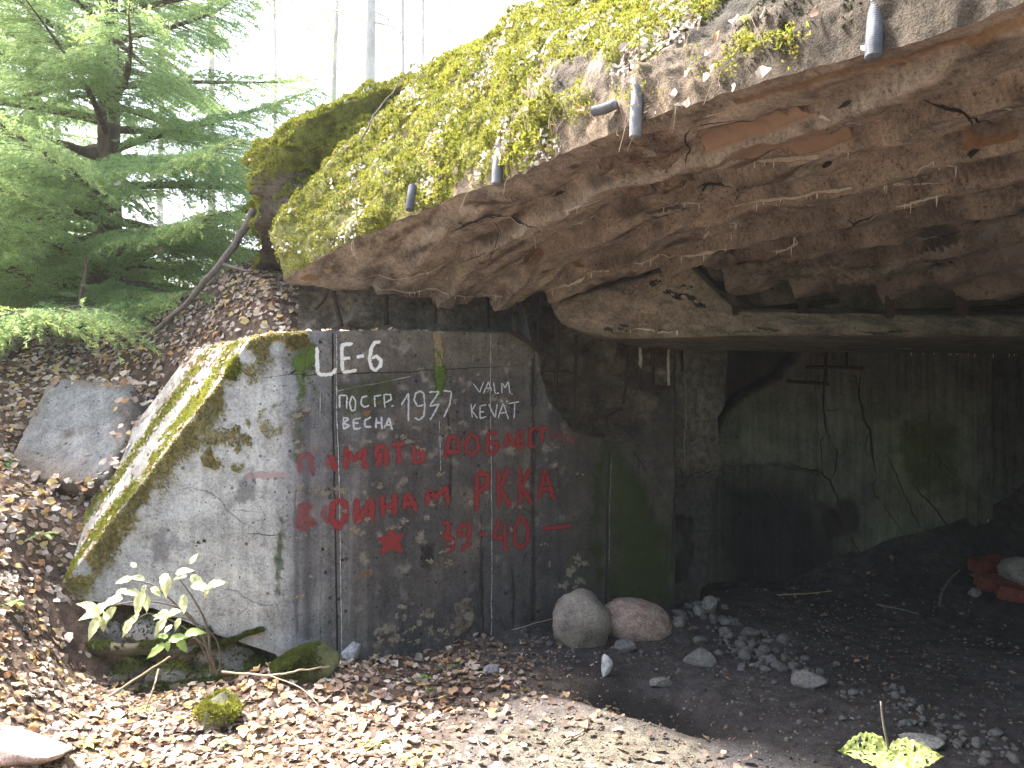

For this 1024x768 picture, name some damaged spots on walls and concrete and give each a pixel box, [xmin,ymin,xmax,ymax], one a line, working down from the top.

crack [924,100,994,126]
peeling [597,106,853,199]
damp [730,161,959,214]
crack [453,214,534,263]
damp [632,222,738,268]
crack [786,371,948,553]